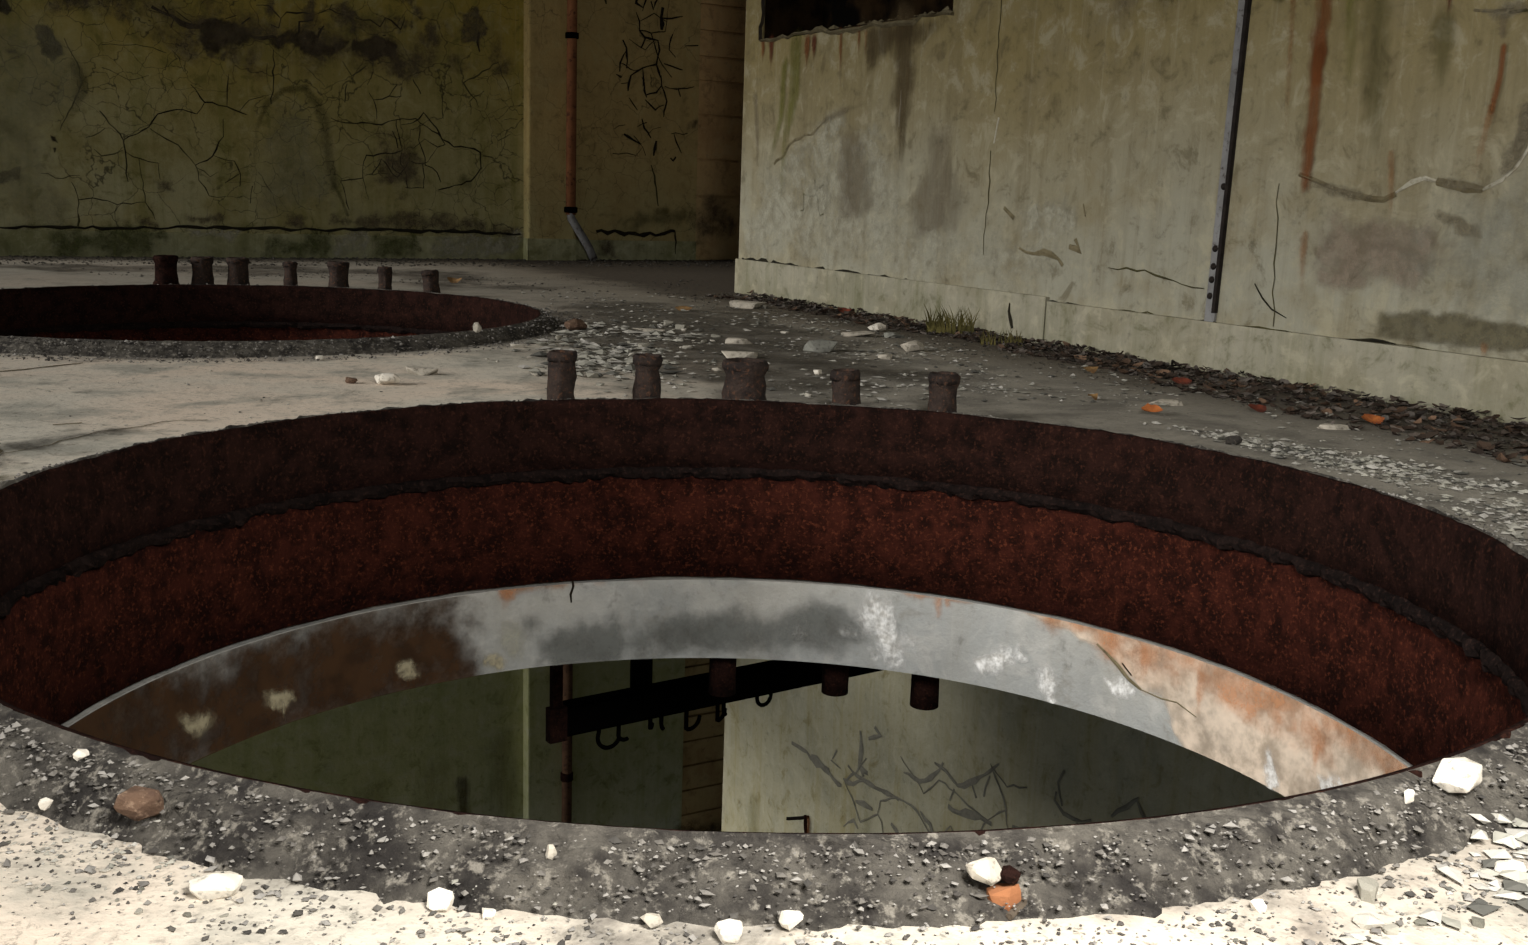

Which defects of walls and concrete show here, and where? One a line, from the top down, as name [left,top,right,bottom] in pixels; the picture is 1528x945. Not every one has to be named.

crack [0,0,521,236]
crack [596,0,698,254]
leakage [867,9,931,126]
rust [1303,0,1331,189]
rust [1489,44,1506,113]
crack [0,363,80,372]
crack [0,420,179,454]
rust [1217,676,1286,718]
crack [791,726,1145,833]